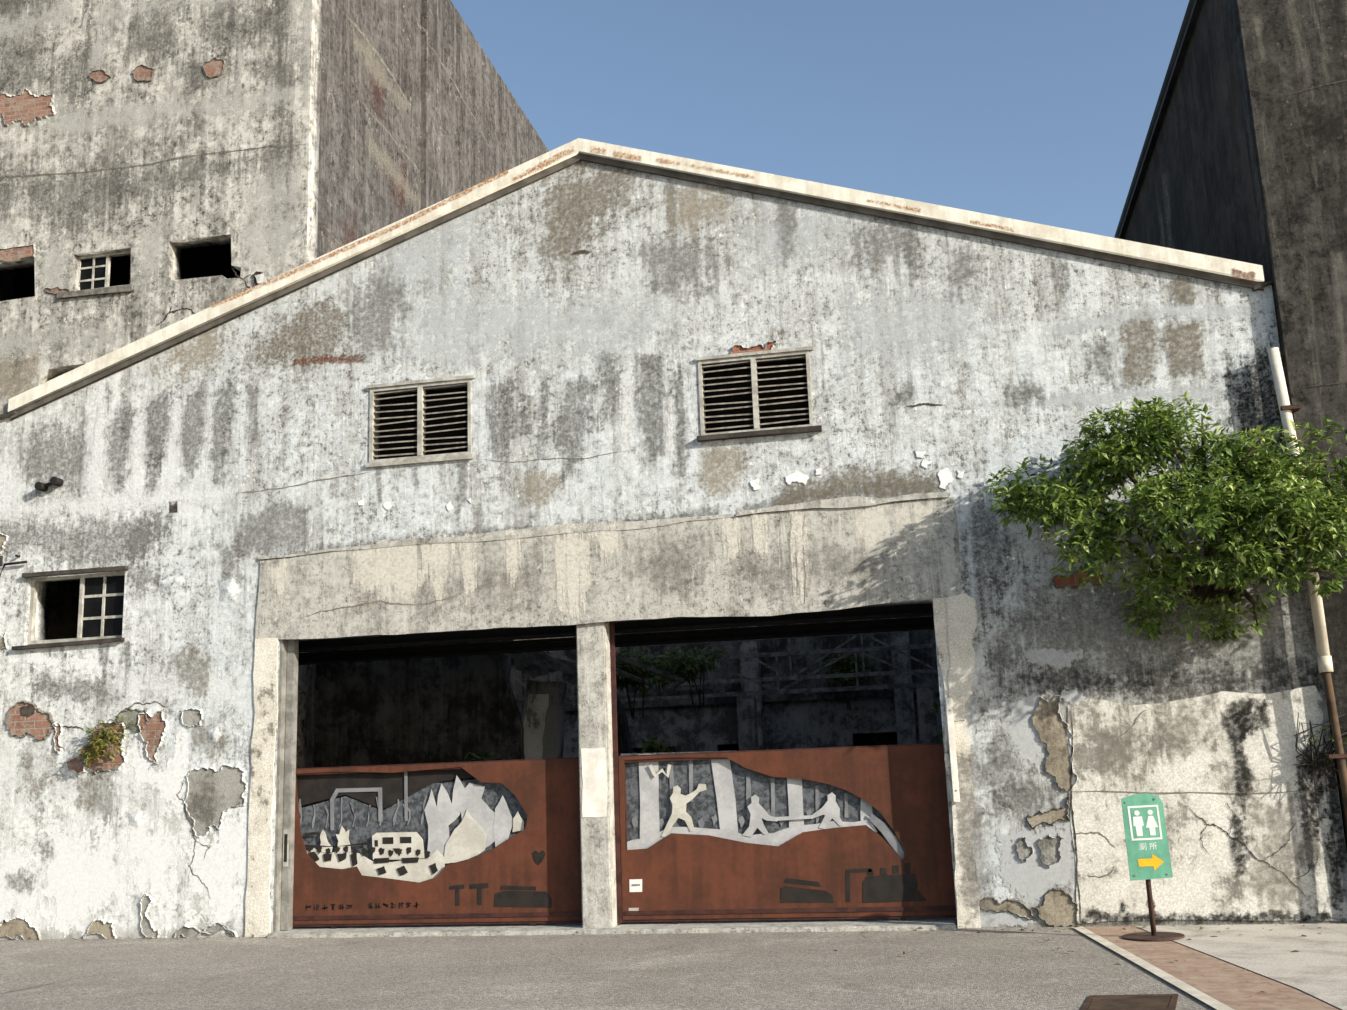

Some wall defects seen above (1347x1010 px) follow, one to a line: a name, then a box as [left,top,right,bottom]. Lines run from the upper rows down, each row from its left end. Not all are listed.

flaking render [0,88,56,128]
flaking render [132,65,156,83]
flaking render [0,244,36,263]
crack [158,307,196,325]
leakage [246,161,945,619]
leakage [1006,276,1287,466]
leakage [31,642,239,708]
leakage [949,498,1347,926]
peeling [0,701,249,940]
crack [176,776,211,899]
peeling [980,687,1090,928]
crack [1070,709,1325,923]